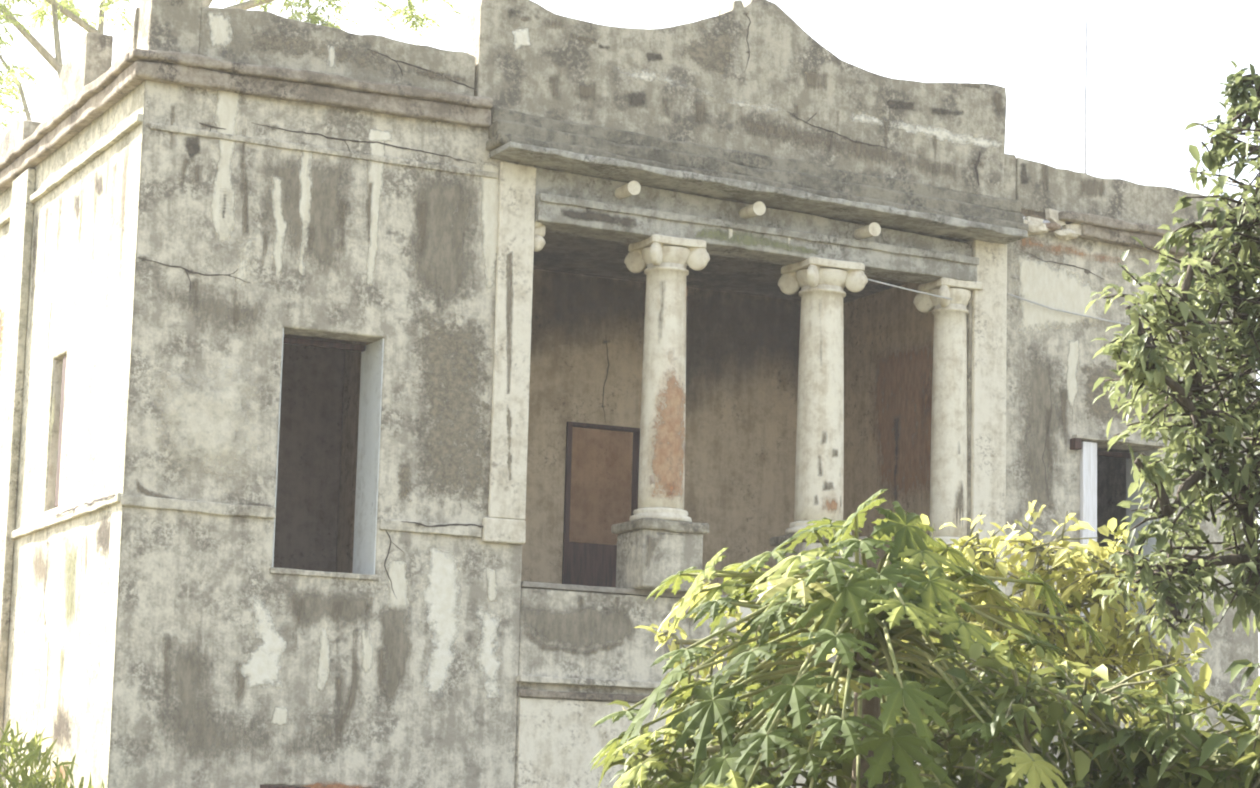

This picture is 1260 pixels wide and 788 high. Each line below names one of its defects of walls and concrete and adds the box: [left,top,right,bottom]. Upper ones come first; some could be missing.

crack [368,49,478,90]
crack [743,11,751,72]
crack [786,111,893,152]
water stain [167,90,347,329]
water stain [367,129,392,285]
crack [137,257,250,293]
water stain [398,163,500,501]
crack [601,334,609,416]
water stain [1016,238,1172,511]
water stain [236,598,286,701]
water stain [287,547,460,753]
water stain [522,597,635,655]